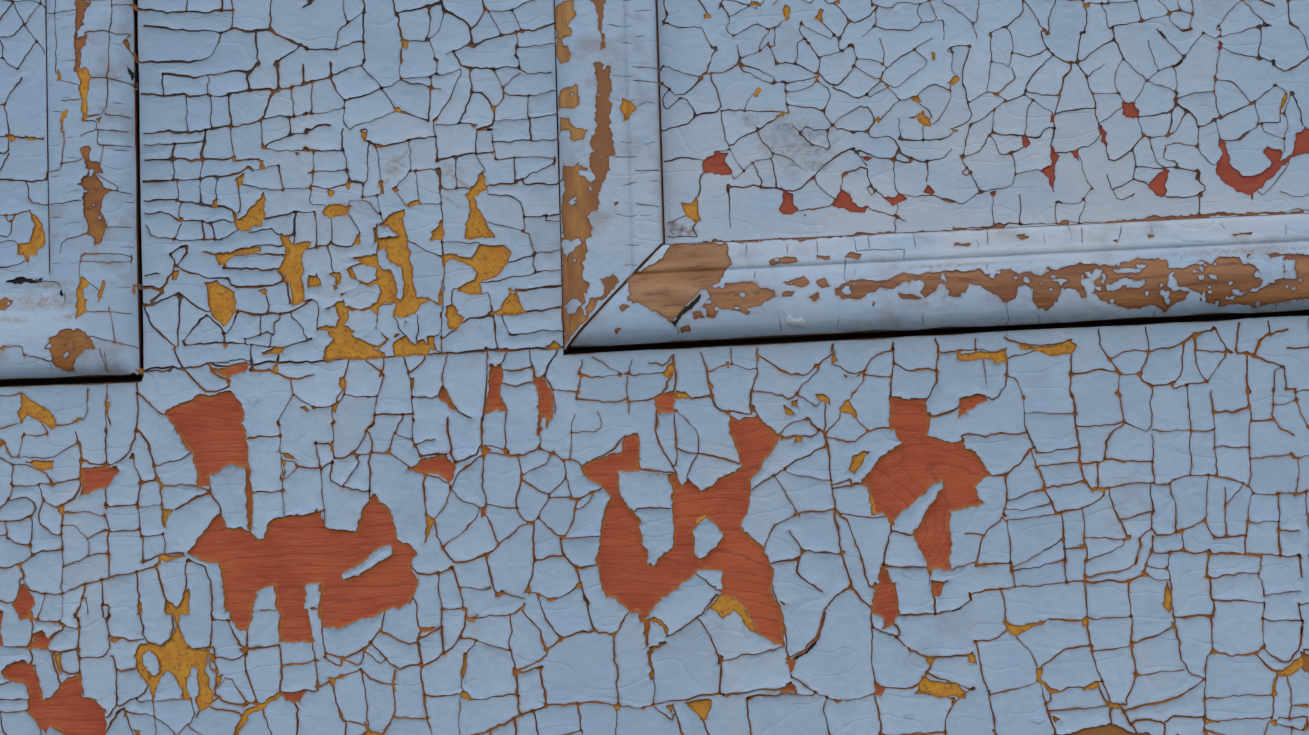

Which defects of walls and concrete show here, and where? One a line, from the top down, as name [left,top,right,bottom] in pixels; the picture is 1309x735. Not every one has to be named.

peeling [77,146,119,245]
peeling [203,192,266,327]
peeling [277,169,511,414]
crack [0,0,989,735]
peeling [543,0,1309,350]
peeling [0,562,108,735]
peeling [109,588,223,713]
peeling [155,346,436,654]
peeling [581,412,803,682]
peeling [871,566,901,629]
peeling [849,393,992,599]
crack [900,304,1309,735]